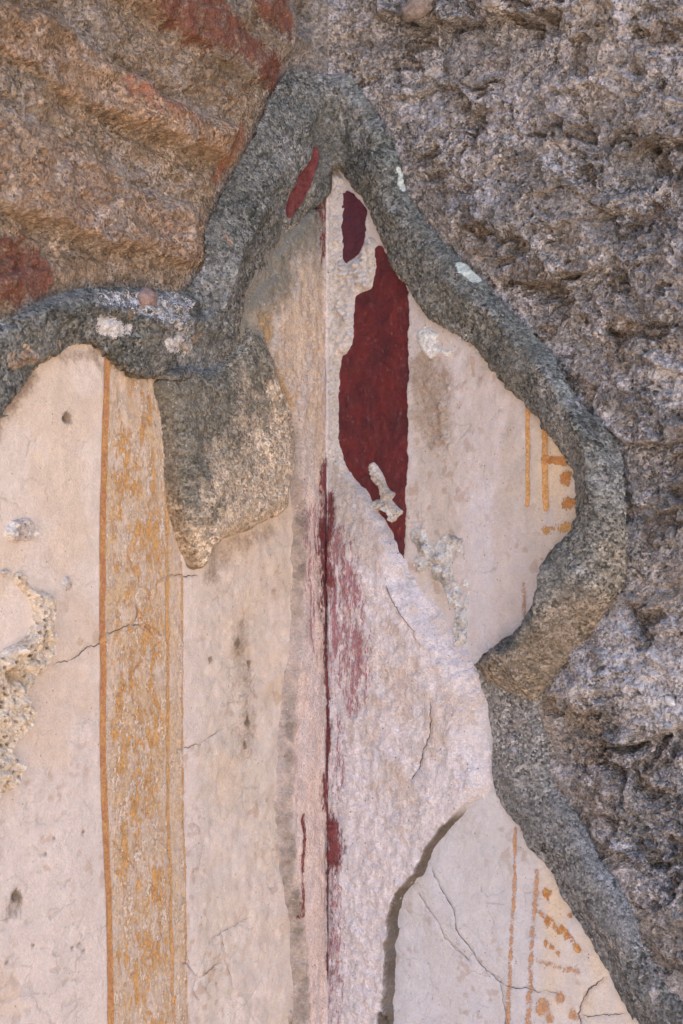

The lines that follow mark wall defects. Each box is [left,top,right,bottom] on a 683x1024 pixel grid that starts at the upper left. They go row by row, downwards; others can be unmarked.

peeling [368,462,403,522]
spalling [4,517,39,544]
spalling [410,525,470,646]
crack [57,611,147,663]
spalling [0,569,58,798]
crack [412,703,432,779]
crack [420,870,557,1022]
crack [578,977,623,1022]